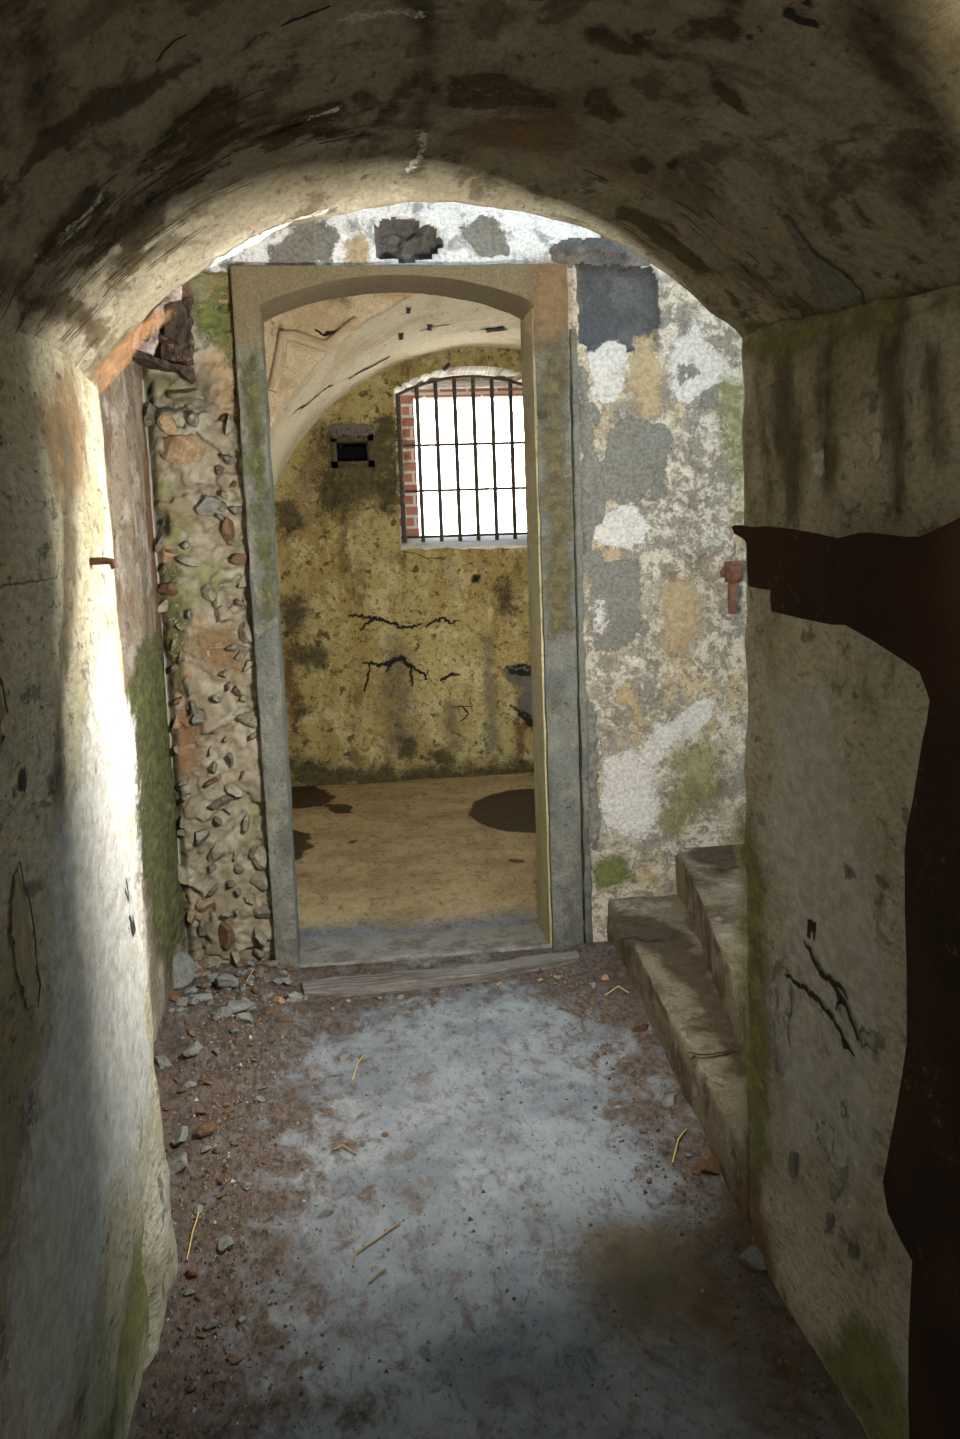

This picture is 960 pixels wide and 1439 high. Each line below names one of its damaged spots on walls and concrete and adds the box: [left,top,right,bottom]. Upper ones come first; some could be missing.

leakage [211,210,330,267]
flaking render [0,61,554,372]
flaking render [583,88,625,124]
spalling [549,200,825,653]
spalling [142,272,275,968]
crack [348,614,471,722]
leakage [3,376,151,1439]
crack [786,940,859,1057]